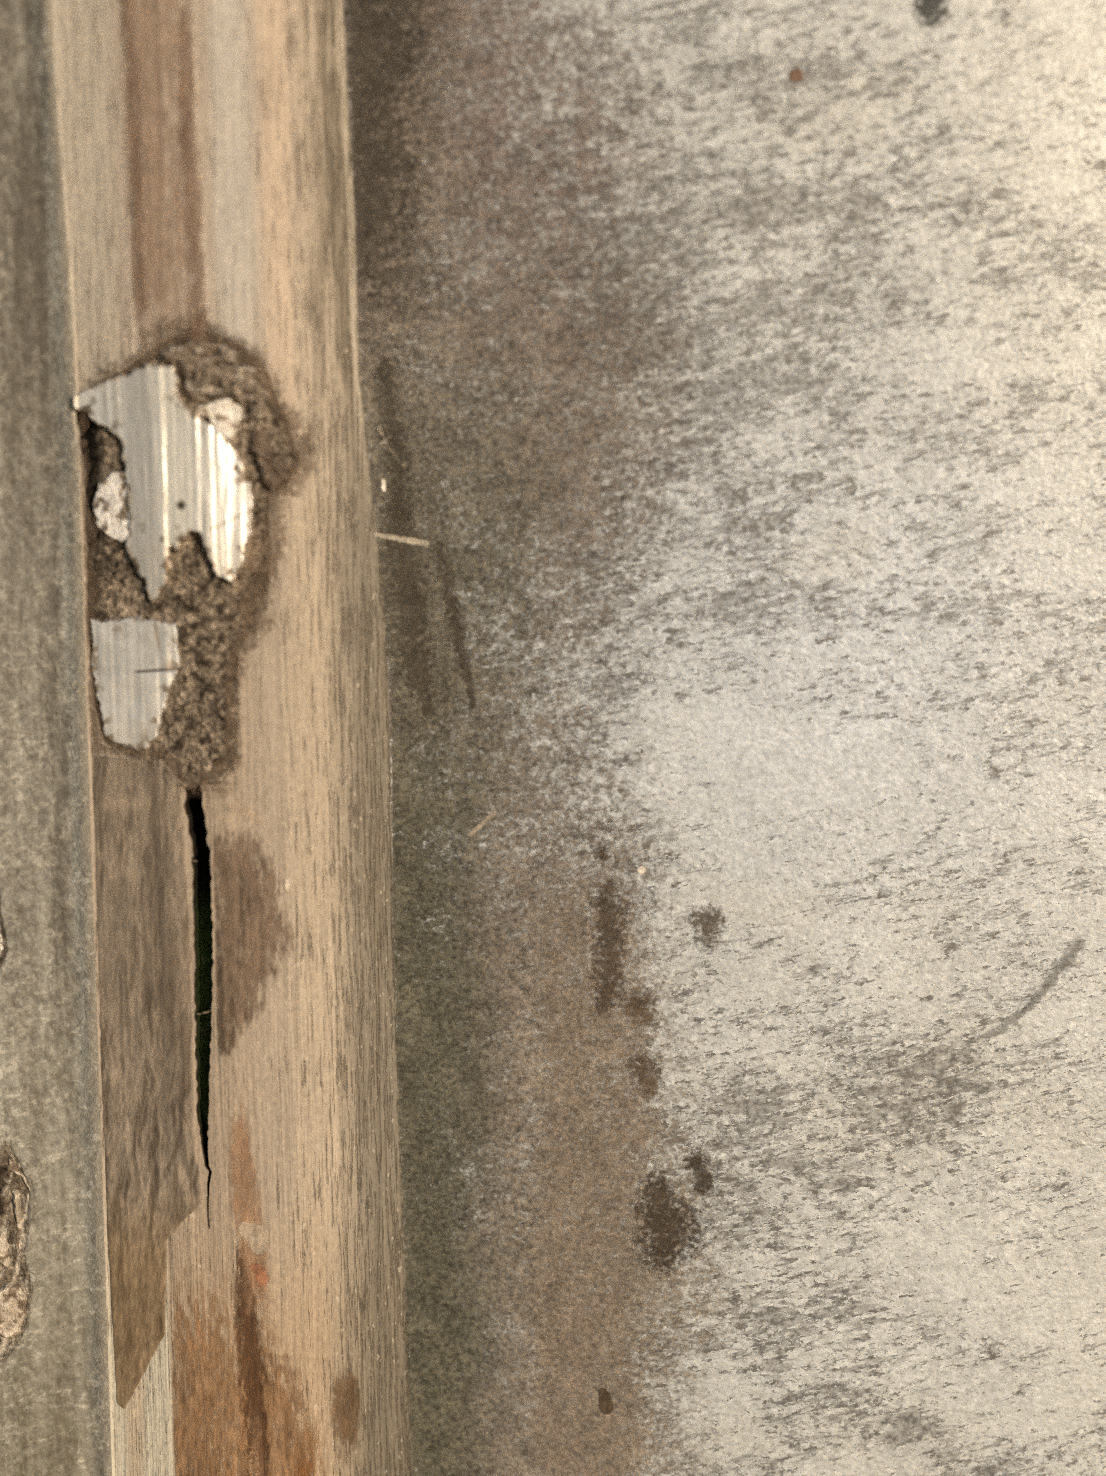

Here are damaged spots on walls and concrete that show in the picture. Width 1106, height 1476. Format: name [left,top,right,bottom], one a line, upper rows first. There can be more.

spalling [72,324,301,1409]
crack [184,760,214,1229]
leakage [213,836,291,1055]
leakage [345,0,727,1476]
spalling [0,1131,36,1362]
corrosion [173,1123,318,1476]
corrosion [332,1374,360,1444]